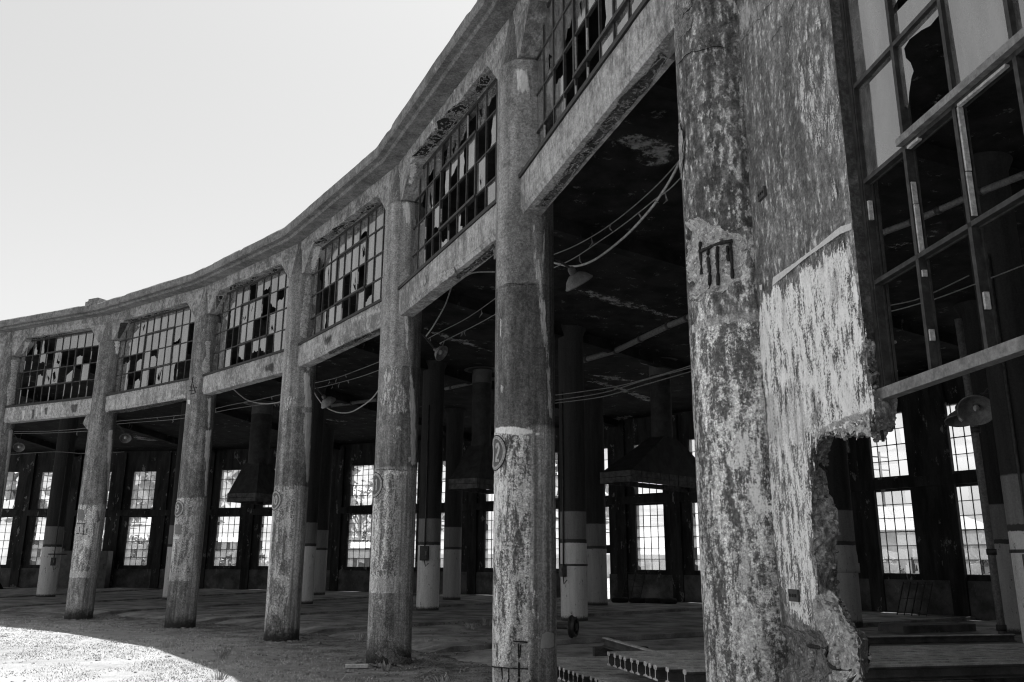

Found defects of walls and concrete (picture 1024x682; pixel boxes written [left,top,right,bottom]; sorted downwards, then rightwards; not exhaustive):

water stain [739,1,756,33]
spalling [411,75,491,158]
water stain [404,316,416,465]
water stain [533,225,552,419]
peeling [726,237,898,682]